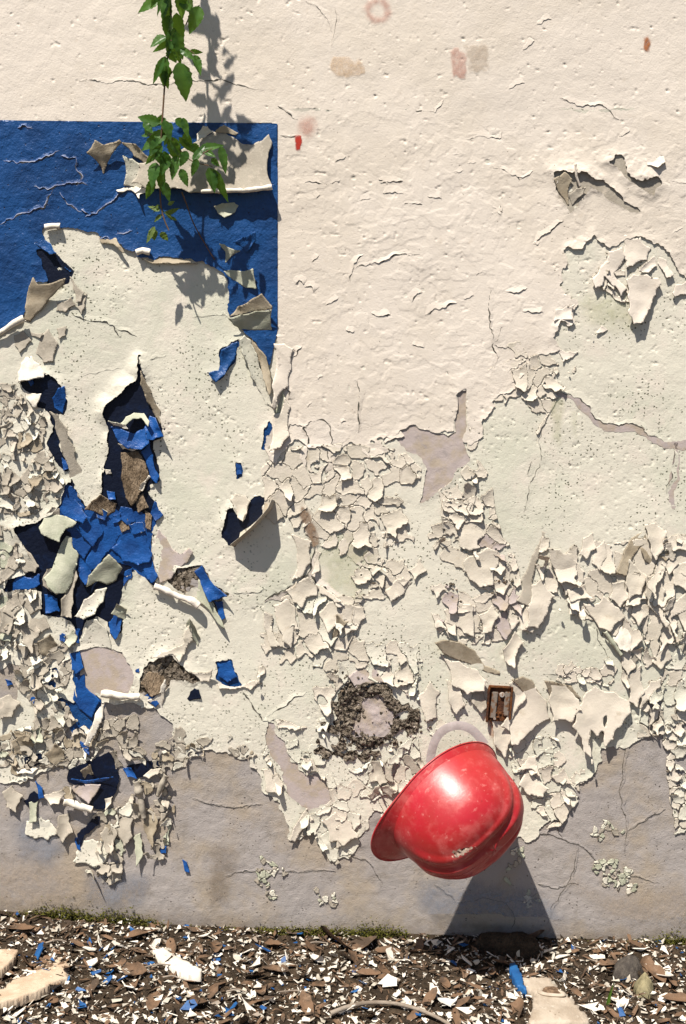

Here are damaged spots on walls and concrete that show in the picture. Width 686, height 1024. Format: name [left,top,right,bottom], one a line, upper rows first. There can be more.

crack [523,13,552,50]
crack [509,78,525,89]
crack [79,74,307,150]
crack [560,96,630,137]
peeling [87,125,273,218]
peeling [554,163,640,213]
peeling [609,154,666,196]
crack [555,389,686,509]
peeling [0,223,686,886]
crack [538,723,665,925]
peeling [254,855,288,900]